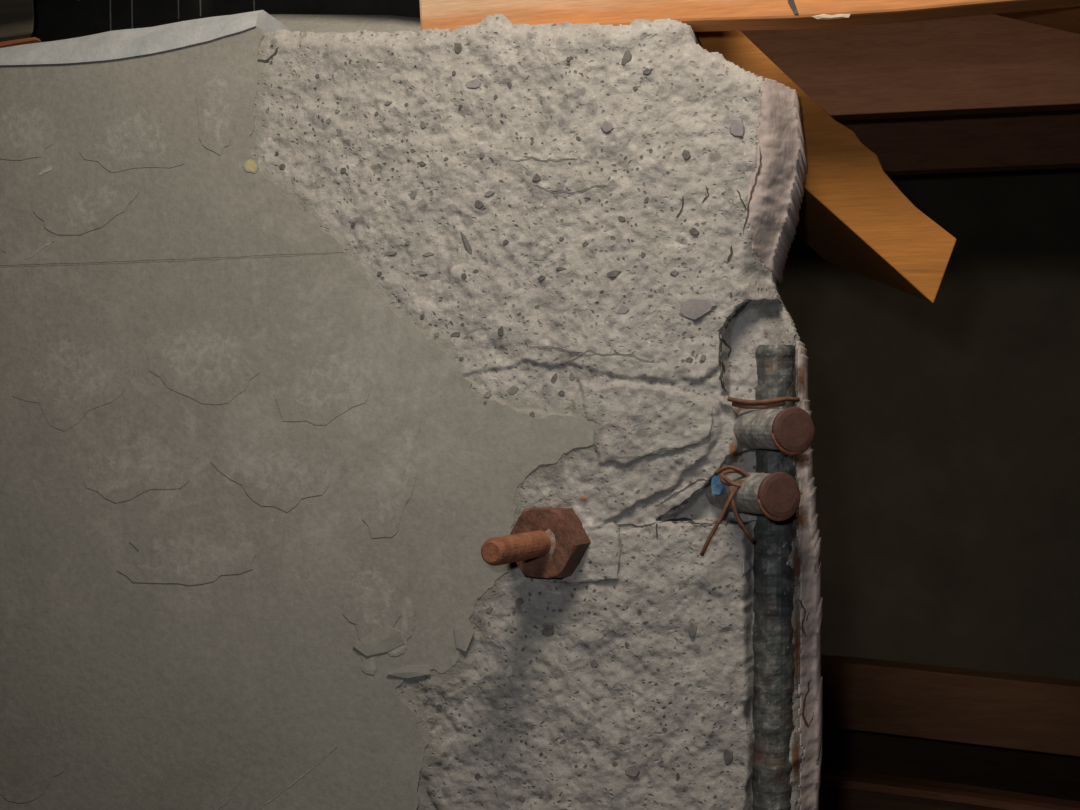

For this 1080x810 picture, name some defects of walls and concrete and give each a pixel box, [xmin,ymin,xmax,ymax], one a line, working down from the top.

crack [514,157,606,193]
spalling [249,14,815,810]
crack [534,300,757,584]